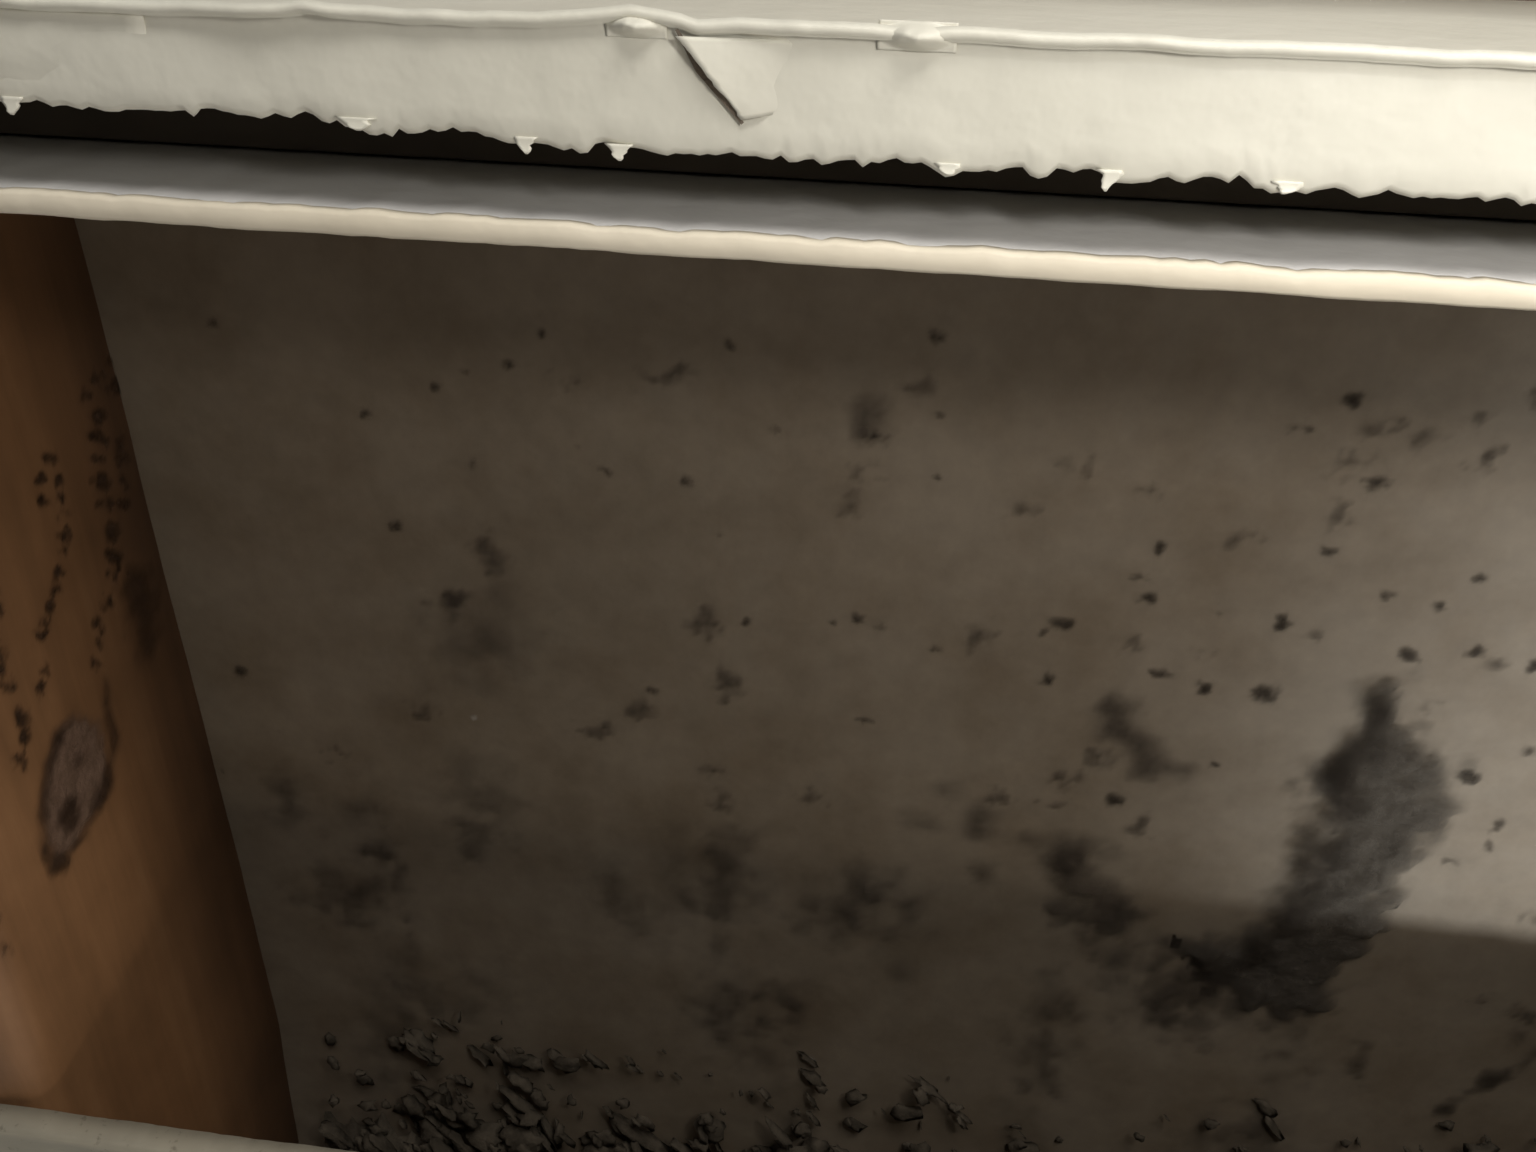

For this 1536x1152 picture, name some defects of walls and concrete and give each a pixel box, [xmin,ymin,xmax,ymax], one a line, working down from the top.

peeling [877,19,959,53]
peeling [675,29,792,125]
peeling [1,96,23,115]
peeling [334,116,377,131]
peeling [514,136,538,154]
peeling [604,143,633,161]
peeling [934,162,960,176]
peeling [1097,169,1124,192]
peeling [1271,180,1304,194]
leakage [1187,686,1454,1020]